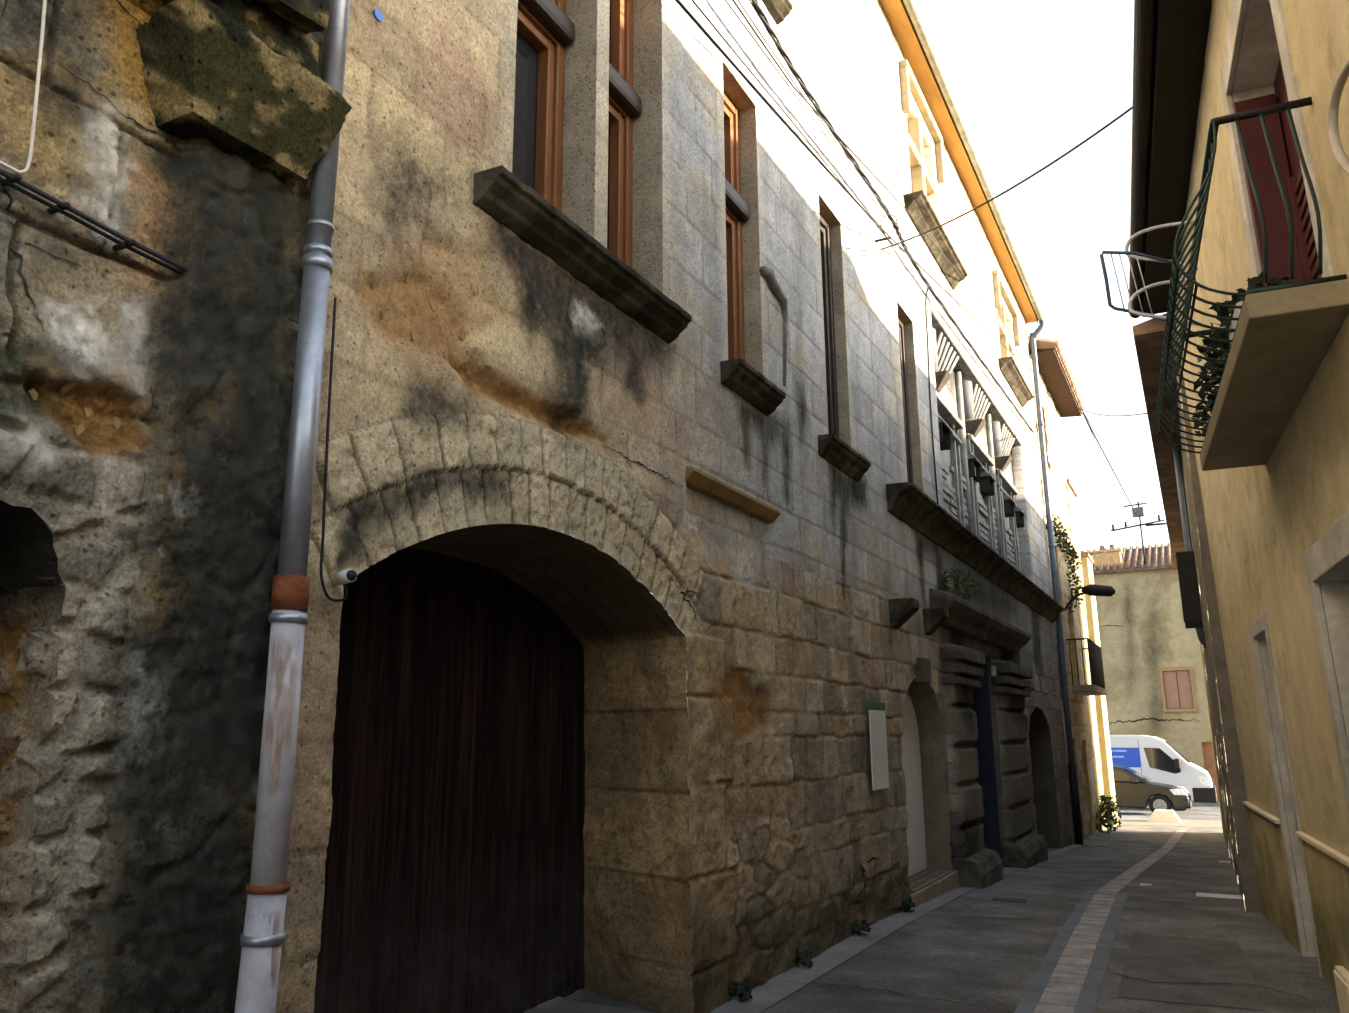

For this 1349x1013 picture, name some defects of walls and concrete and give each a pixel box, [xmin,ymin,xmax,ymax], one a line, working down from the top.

peeling [82,106,128,229]
crack [0,182,81,332]
peeling [47,302,147,385]
damp [497,222,670,423]
spalling [0,382,146,471]
damp [742,393,807,504]
damp [832,466,865,579]